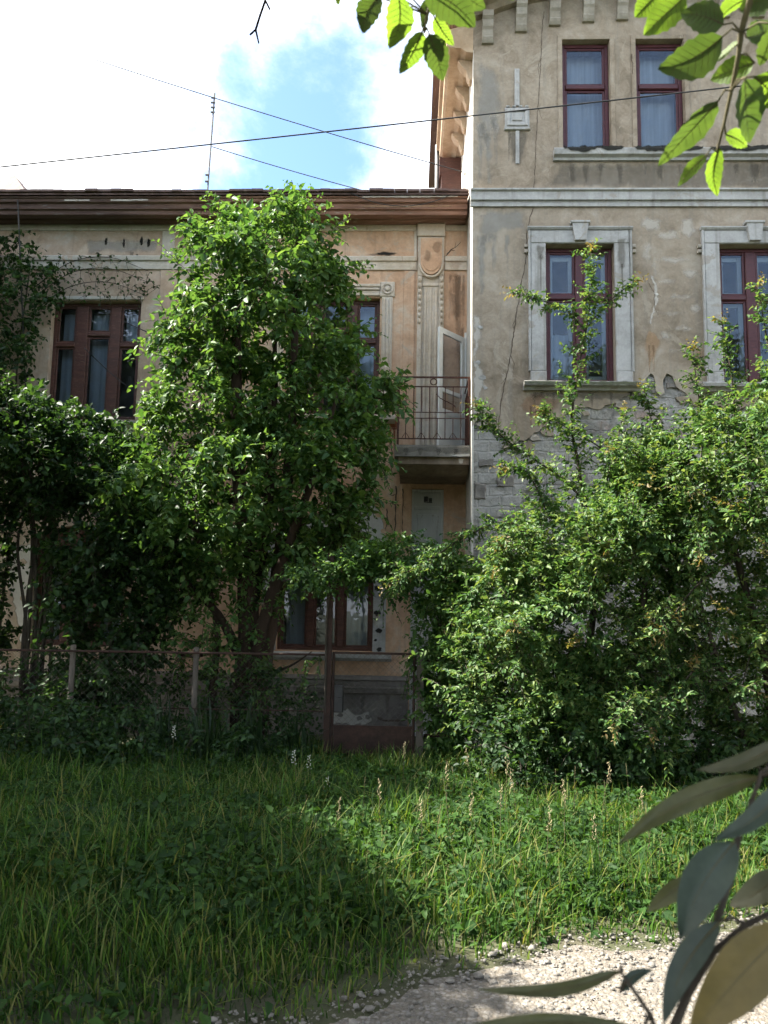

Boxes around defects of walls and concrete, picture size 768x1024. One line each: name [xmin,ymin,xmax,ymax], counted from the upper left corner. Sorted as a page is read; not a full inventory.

crack [498,15,544,428]
flaking render [333,709,372,725]
flaking render [473,317,768,752]